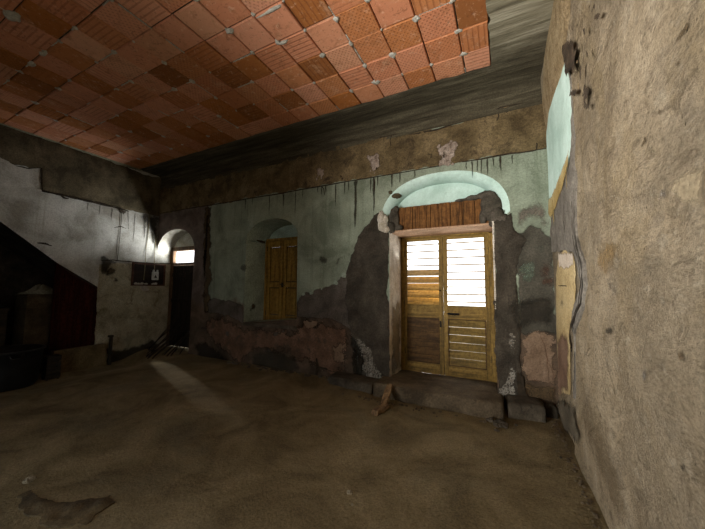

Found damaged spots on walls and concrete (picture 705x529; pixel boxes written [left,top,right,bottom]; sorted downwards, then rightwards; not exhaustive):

flaking render [0,0,589,216]
damp [128,213,159,242]
damp [335,181,357,225]
spalling [377,210,390,233]
peeling [519,206,544,222]
peeling [204,266,350,376]
damp [351,337,382,379]
damp [498,362,517,398]
peeling [517,331,557,397]